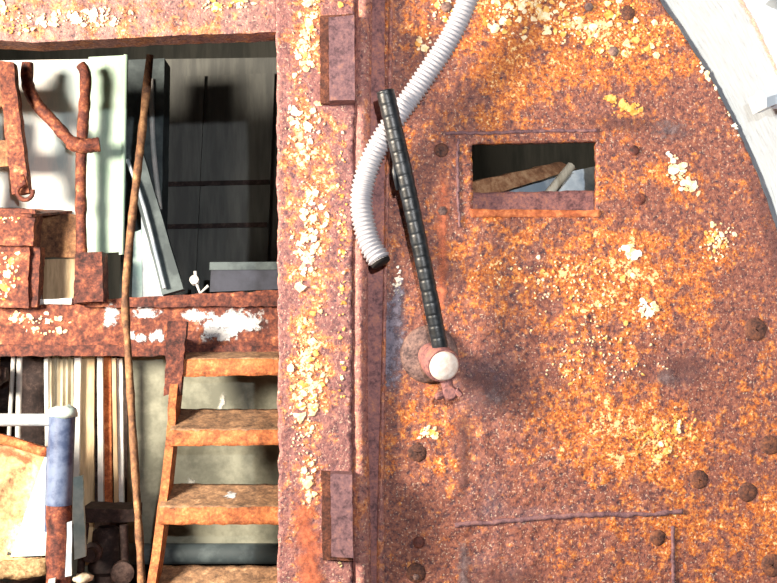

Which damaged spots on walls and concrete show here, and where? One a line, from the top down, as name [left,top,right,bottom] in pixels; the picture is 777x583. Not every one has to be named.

corrosion [739,0,777,74]
corrosion [436,185,448,308]